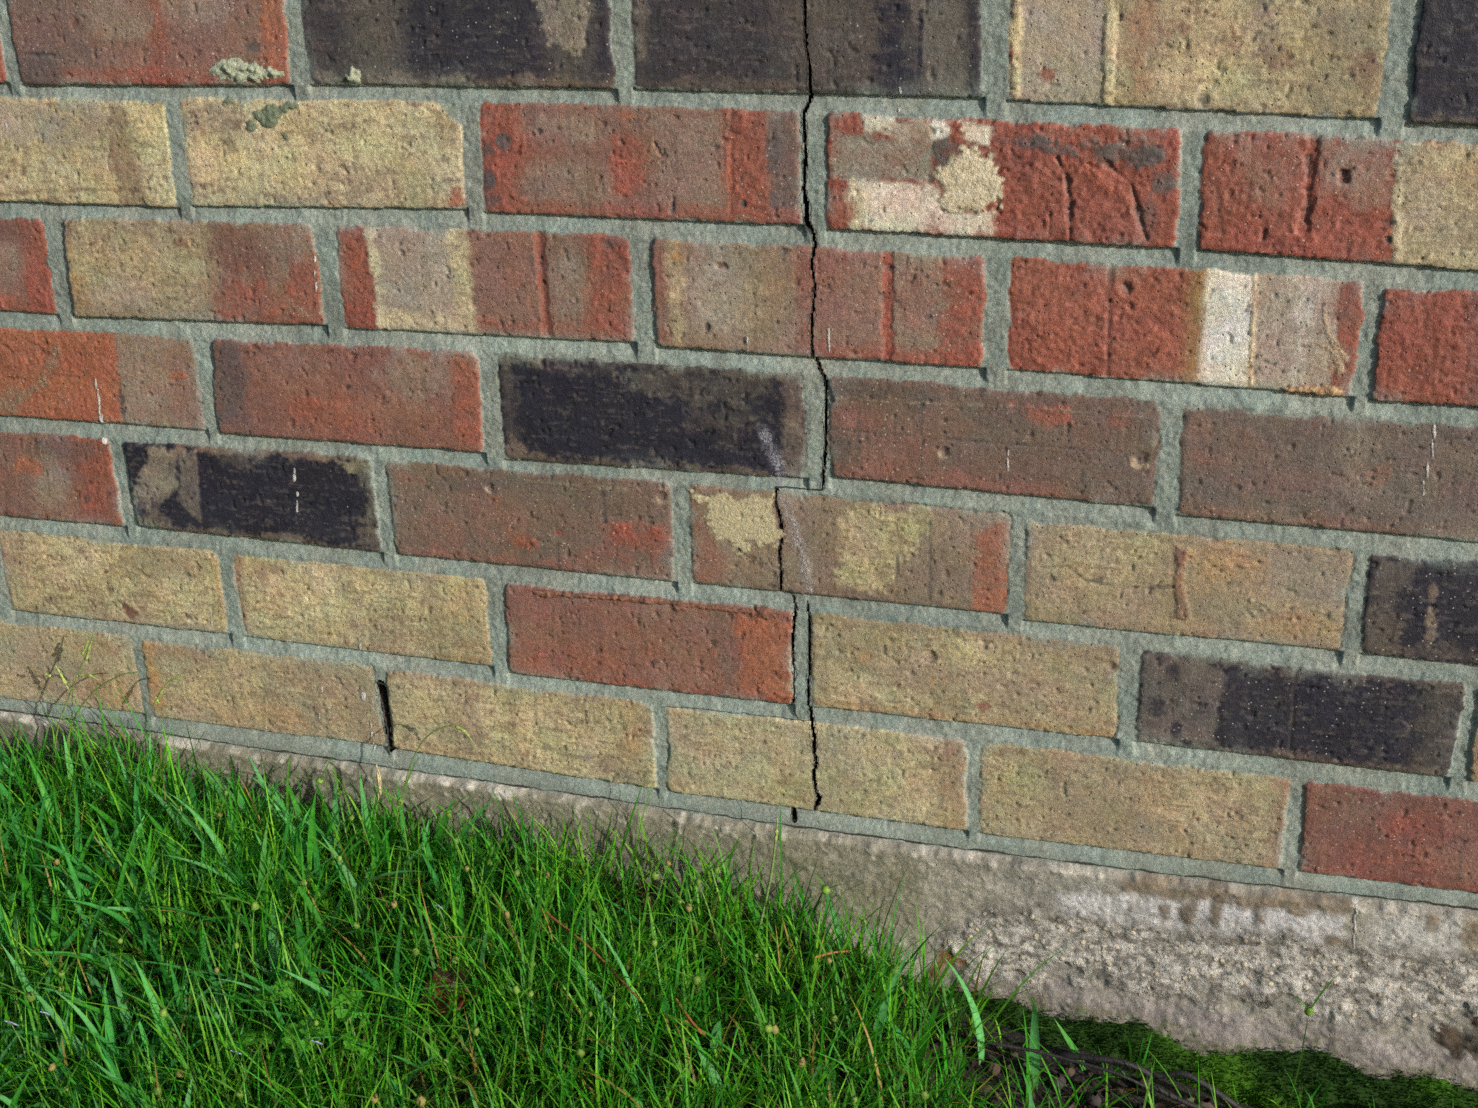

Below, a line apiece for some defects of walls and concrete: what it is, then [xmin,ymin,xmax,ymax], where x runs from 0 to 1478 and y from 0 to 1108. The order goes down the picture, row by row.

crack [666,0,830,811]
crack [0,709,1478,911]
damp [1122,879,1352,935]
damp [1326,937,1350,947]
damp [1436,1016,1478,1060]